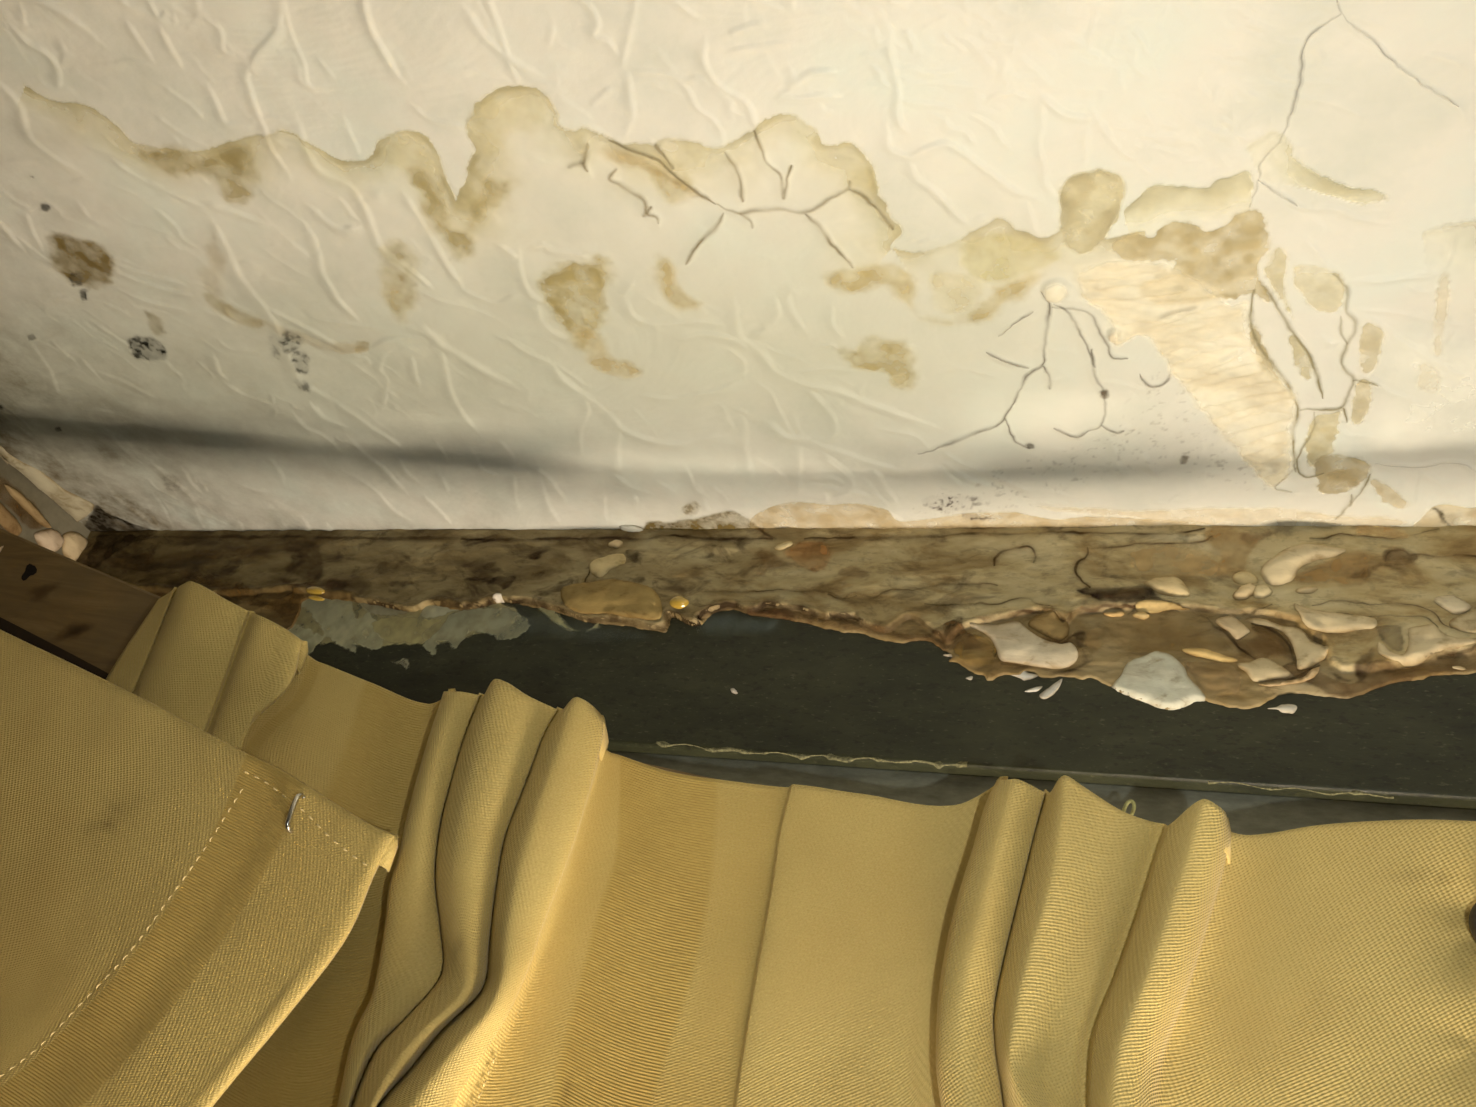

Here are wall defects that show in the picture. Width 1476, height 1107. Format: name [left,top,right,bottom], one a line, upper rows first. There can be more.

water stain [409,132,491,214]
crack [582,140,716,205]
water stain [53,236,112,299]
water stain [969,171,1284,305]
crack [980,352,1046,449]
crack [1013,297,1167,388]
crack [1250,289,1377,478]
water stain [1306,325,1405,507]
flaking render [0,446,94,561]
peeling [970,610,1078,699]
peeling [1077,576,1190,620]
peeling [1111,544,1476,710]